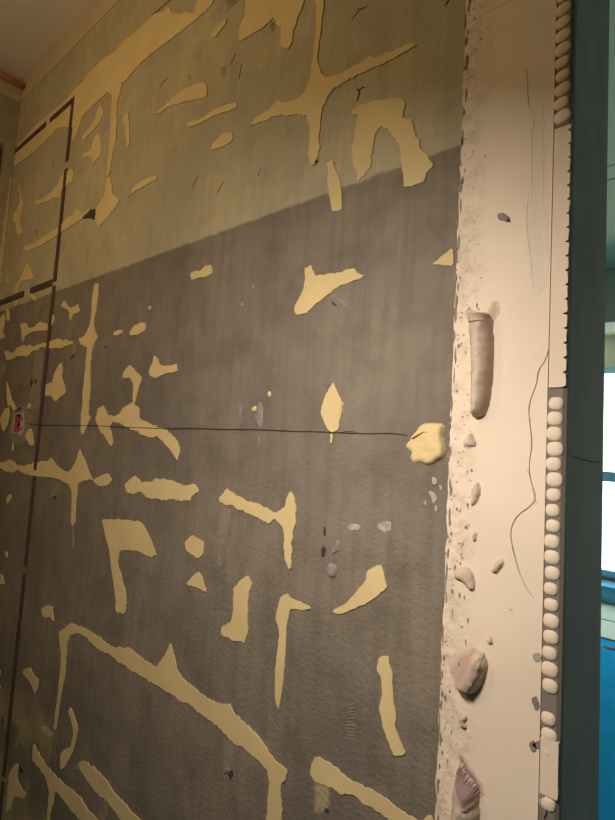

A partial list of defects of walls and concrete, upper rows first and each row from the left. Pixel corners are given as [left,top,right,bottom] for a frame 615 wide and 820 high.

peeling [14,0,214,251]
peeling [294,265,366,315]
peeling [0,283,180,460]
crack [27,423,404,440]
peeling [406,396,459,465]
peeling [102,519,156,614]
peeling [219,489,297,570]
peeling [333,565,388,614]
peeling [275,594,311,709]
peeling [32,623,288,820]
peeling [377,656,406,756]
peeling [310,757,439,820]